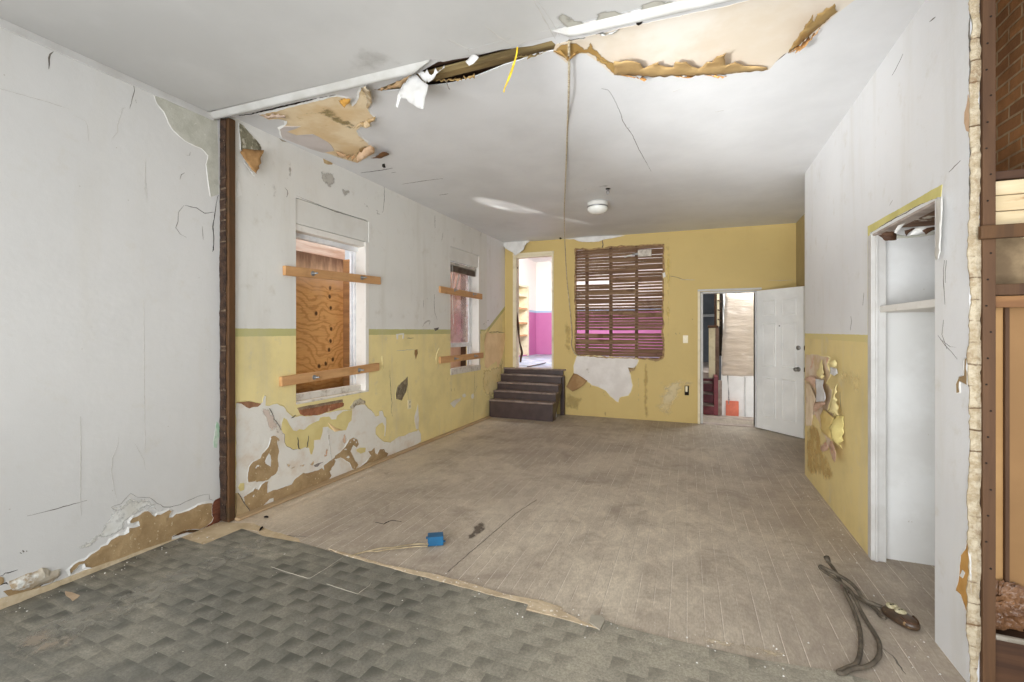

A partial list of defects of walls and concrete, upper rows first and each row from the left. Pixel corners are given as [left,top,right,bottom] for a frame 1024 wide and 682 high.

peeling [553,0,854,76]
flaking render [153,95,220,197]
flaking render [238,123,262,151]
peeling [257,85,389,165]
crack [176,197,218,252]
peeling [573,244,665,403]
flaking render [955,0,981,682]
flaking render [395,376,408,401]
peeling [804,353,844,462]
peeling [235,395,421,517]
flaking render [65,493,221,576]